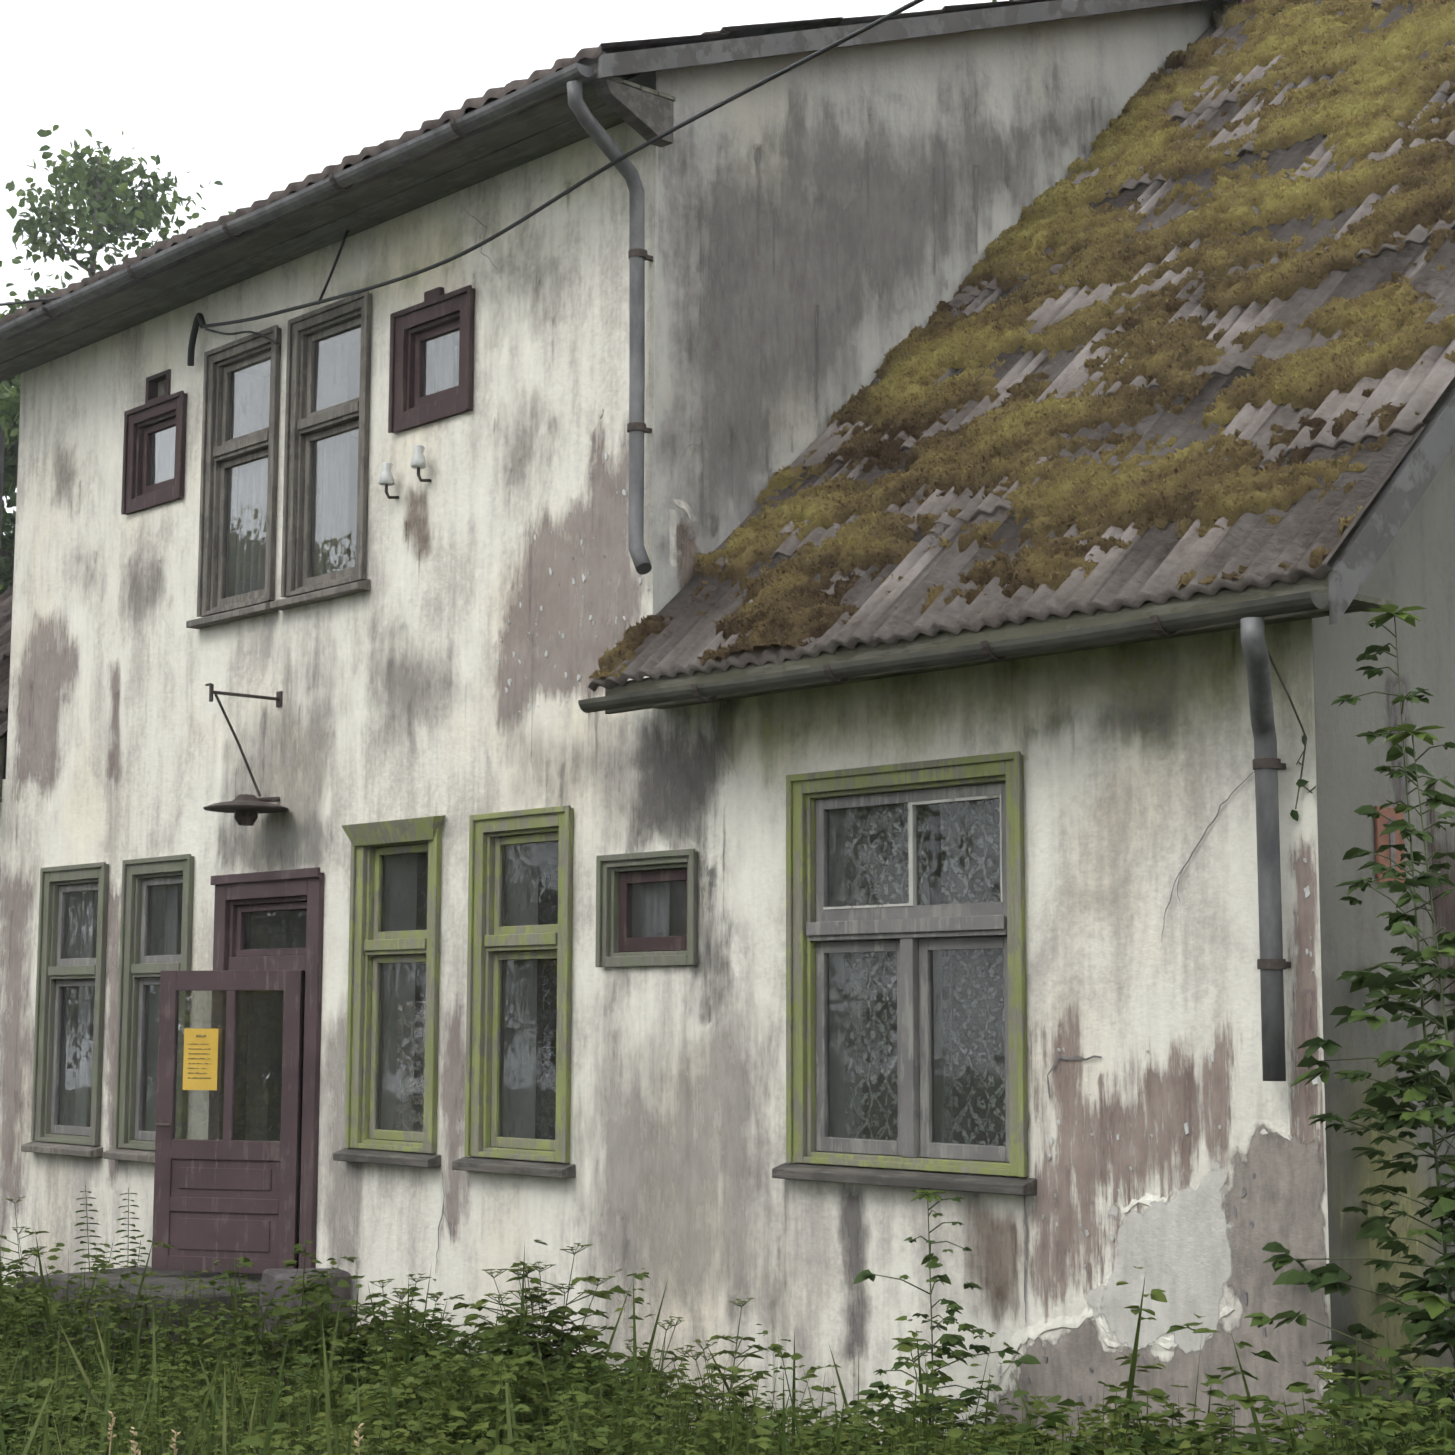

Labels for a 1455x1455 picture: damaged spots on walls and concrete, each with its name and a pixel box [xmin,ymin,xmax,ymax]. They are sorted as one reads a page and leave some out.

water stain [673,85,1109,535]
water stain [15,619,78,794]
water stain [592,700,734,847]
crack [1162,771,1255,934]
spalling [989,838,1331,1454]